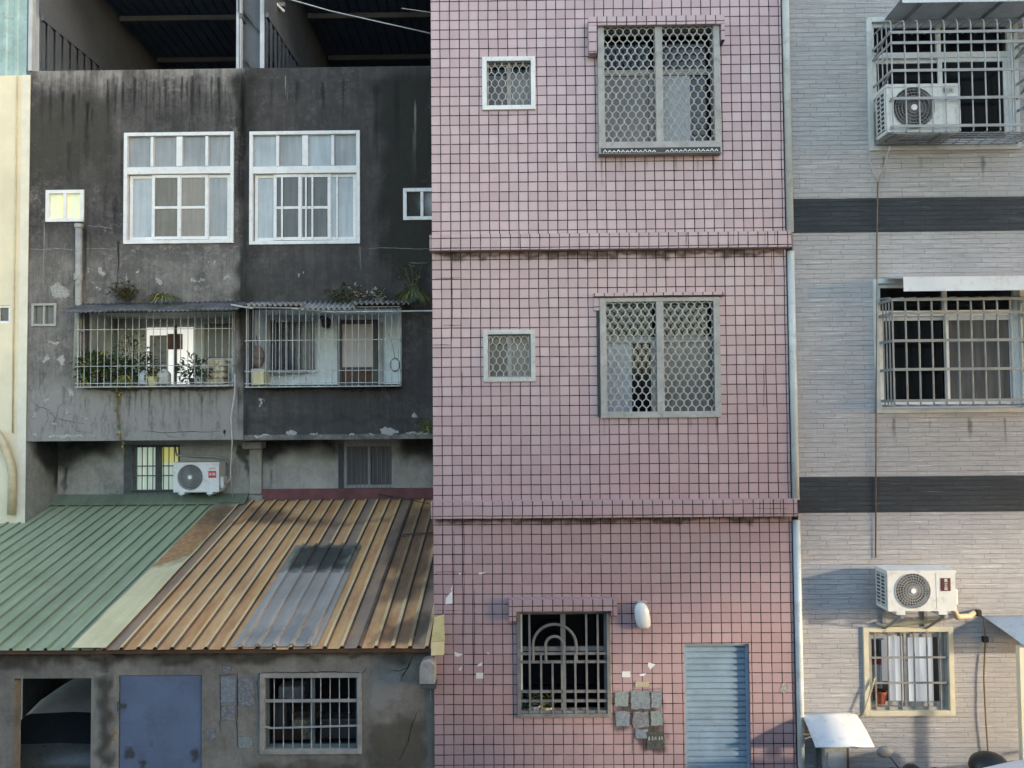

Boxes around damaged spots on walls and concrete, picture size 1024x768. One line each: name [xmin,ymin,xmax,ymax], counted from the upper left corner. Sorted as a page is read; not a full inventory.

spalling [369,413,429,436]